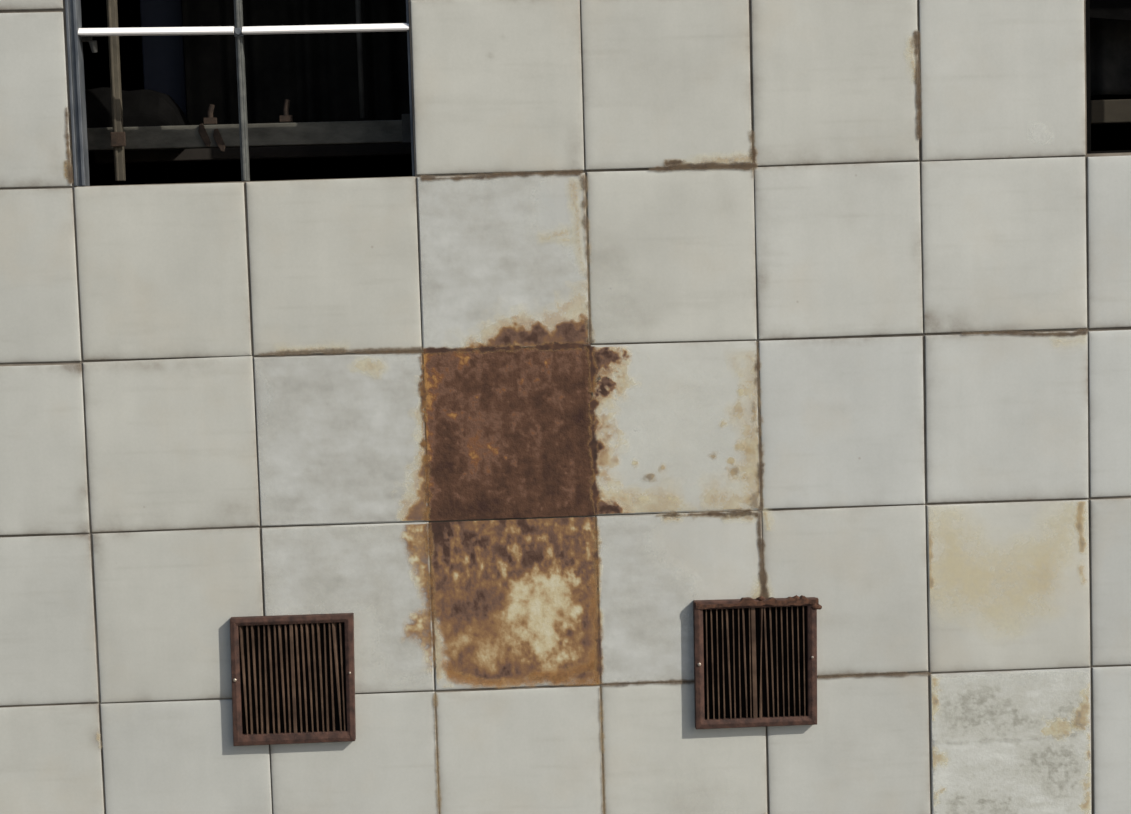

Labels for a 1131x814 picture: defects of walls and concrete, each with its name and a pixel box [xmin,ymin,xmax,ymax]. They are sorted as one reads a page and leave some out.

corrosion [910,31,922,139]
corrosion [650,133,757,172]
corrosion [421,170,589,256]
corrosion [260,274,819,814]
damp [929,501,1086,629]